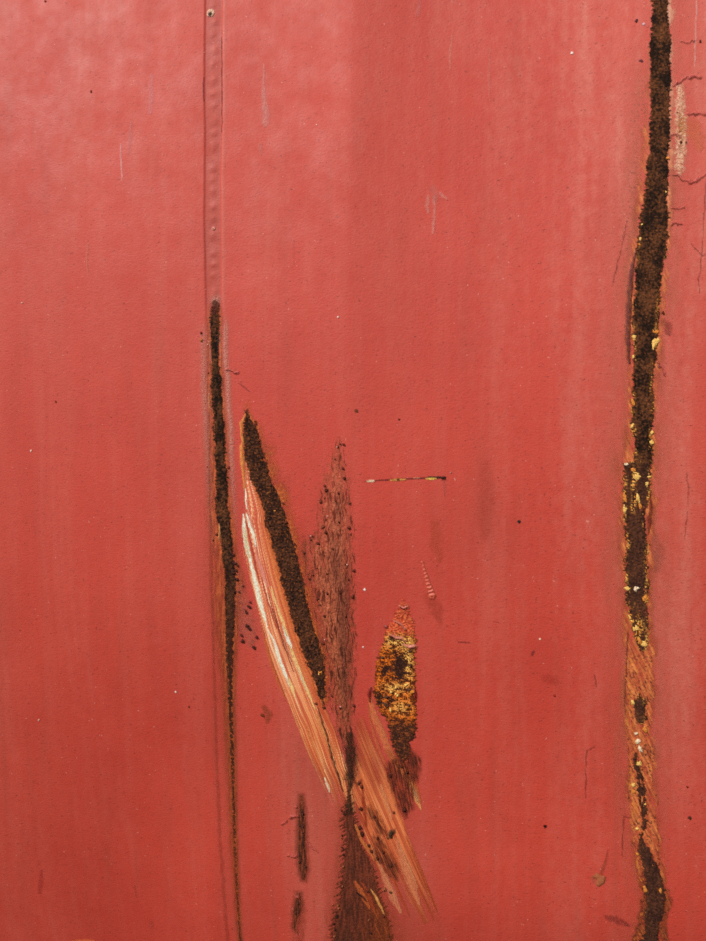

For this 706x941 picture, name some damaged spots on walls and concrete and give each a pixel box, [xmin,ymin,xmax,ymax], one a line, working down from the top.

corrosion [200,297,259,941]
spalling [240,410,328,709]
corrosion [289,893,301,931]
corrosion [281,795,314,880]
corrosion [302,442,397,941]
corrosion [367,600,420,816]
corrosion [619,0,674,941]